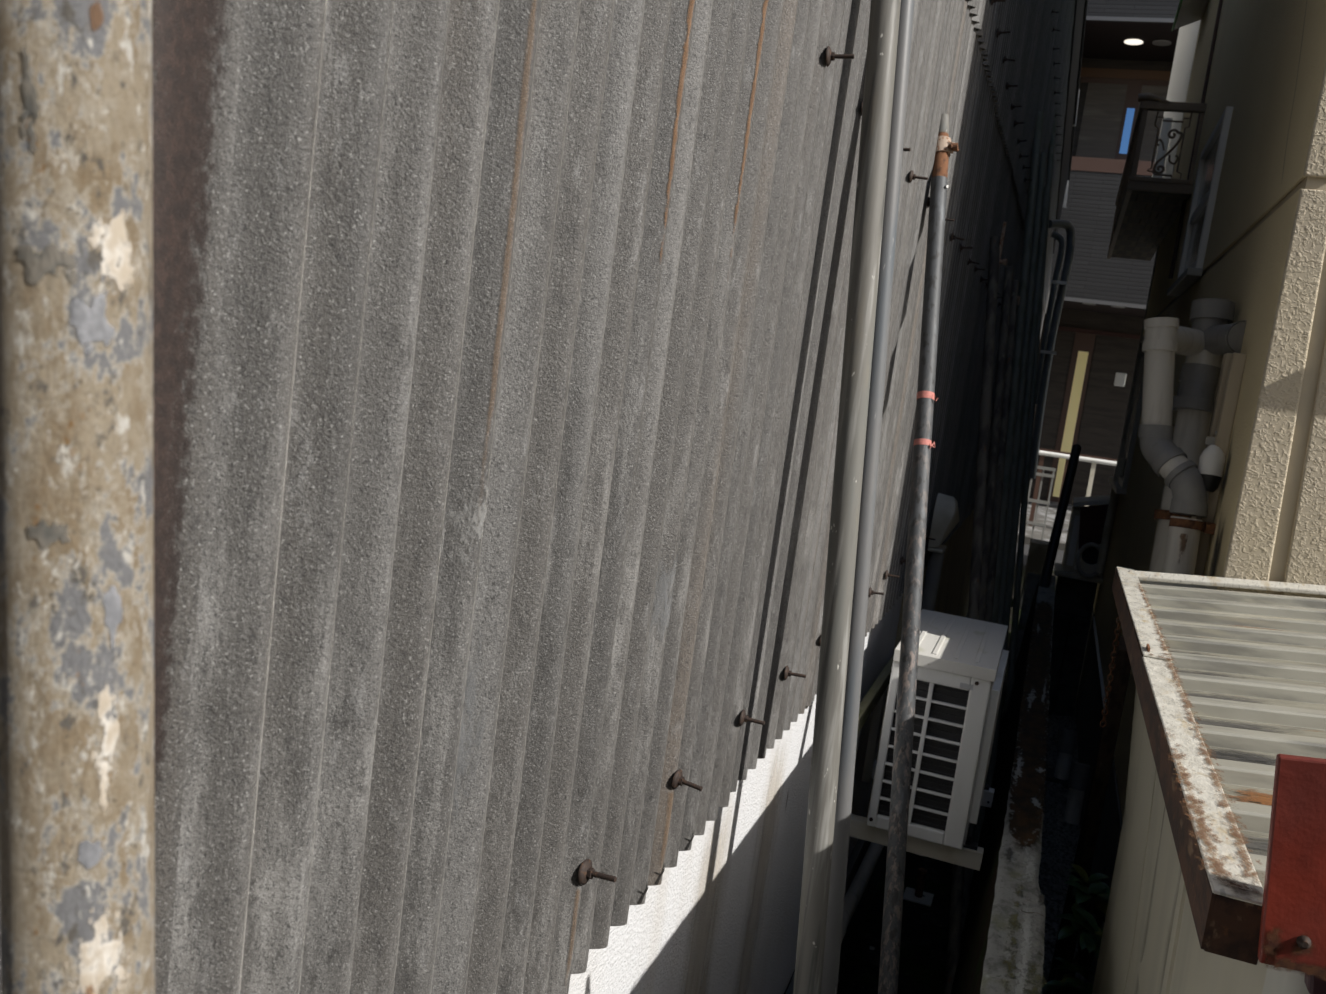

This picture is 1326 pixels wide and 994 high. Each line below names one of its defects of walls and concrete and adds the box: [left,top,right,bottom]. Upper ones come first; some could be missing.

peeling [20,46,40,153]
corrosion [665,0,695,225]
corrosion [734,0,769,229]
peeling [17,209,138,354]
corrosion [1136,582,1273,895]
leakage [686,848,720,994]
leakage [739,772,780,994]
corrosion [1265,955,1326,981]